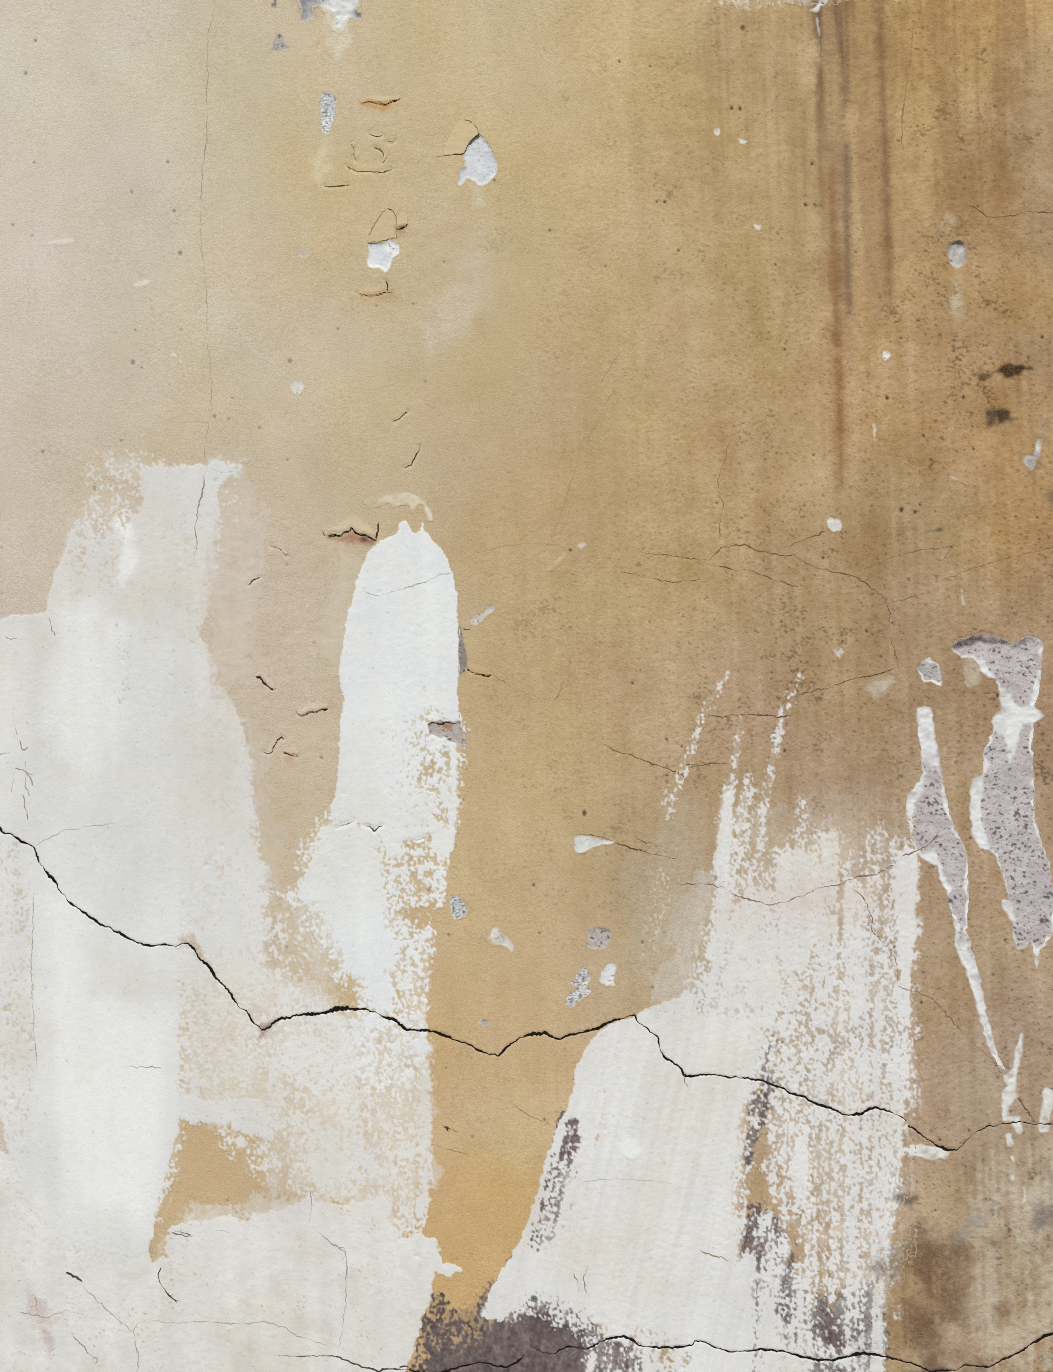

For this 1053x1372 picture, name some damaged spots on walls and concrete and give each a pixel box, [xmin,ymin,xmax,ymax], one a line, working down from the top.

spalling [270,0,363,33]
spalling [318,91,338,136]
peeling [357,95,403,114]
peeling [436,118,498,186]
spalling [356,208,411,305]
water stain [637,0,1053,495]
peeling [322,512,379,550]
spalling [915,655,985,691]
crack [0,712,1051,1151]
spalling [564,926,618,1009]
crack [585,1177,671,1185]
crack [18,1190,1053,1372]